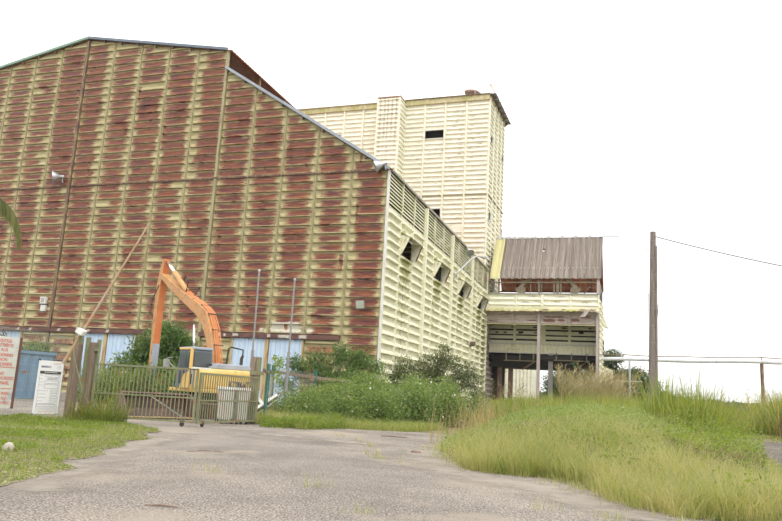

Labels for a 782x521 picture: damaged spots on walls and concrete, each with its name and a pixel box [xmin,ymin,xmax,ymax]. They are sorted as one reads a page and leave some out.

corrosion [0,46,386,382]